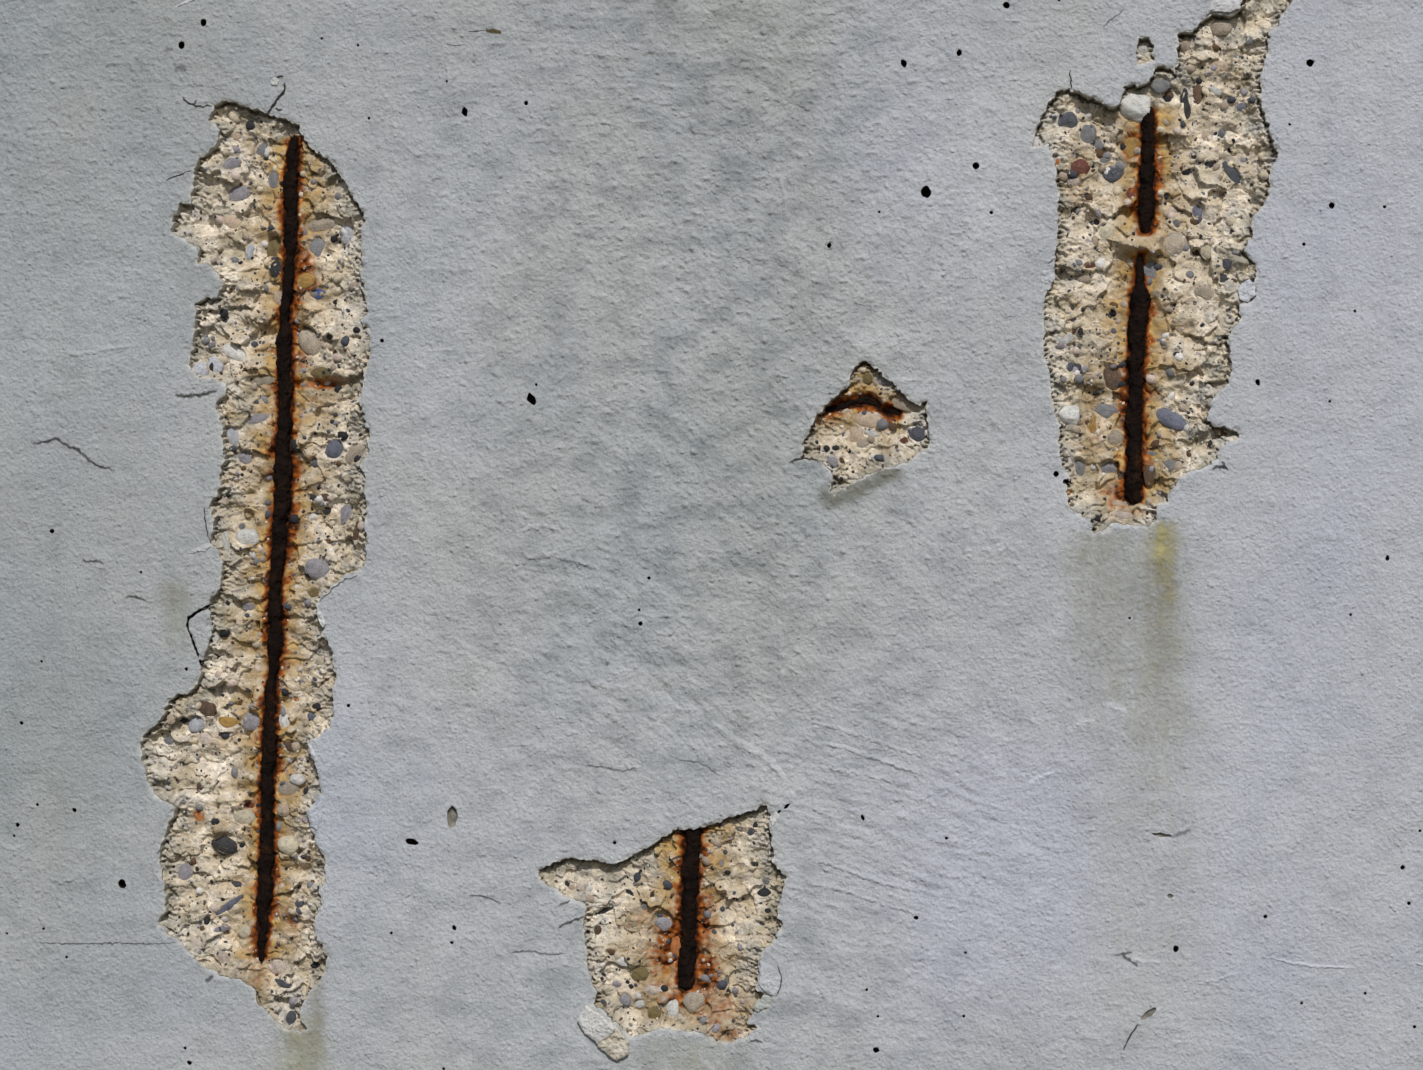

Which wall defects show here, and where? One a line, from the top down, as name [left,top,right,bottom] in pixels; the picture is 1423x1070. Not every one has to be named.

spalling [142,103,371,1032]
corrosion [236,136,338,961]
corrosion [817,373,903,427]
spalling [801,362,930,495]
corrosion [1101,106,1174,511]
spalling [1032,0,1293,534]
spalling [539,805,786,1043]
corrosion [649,824,740,1039]